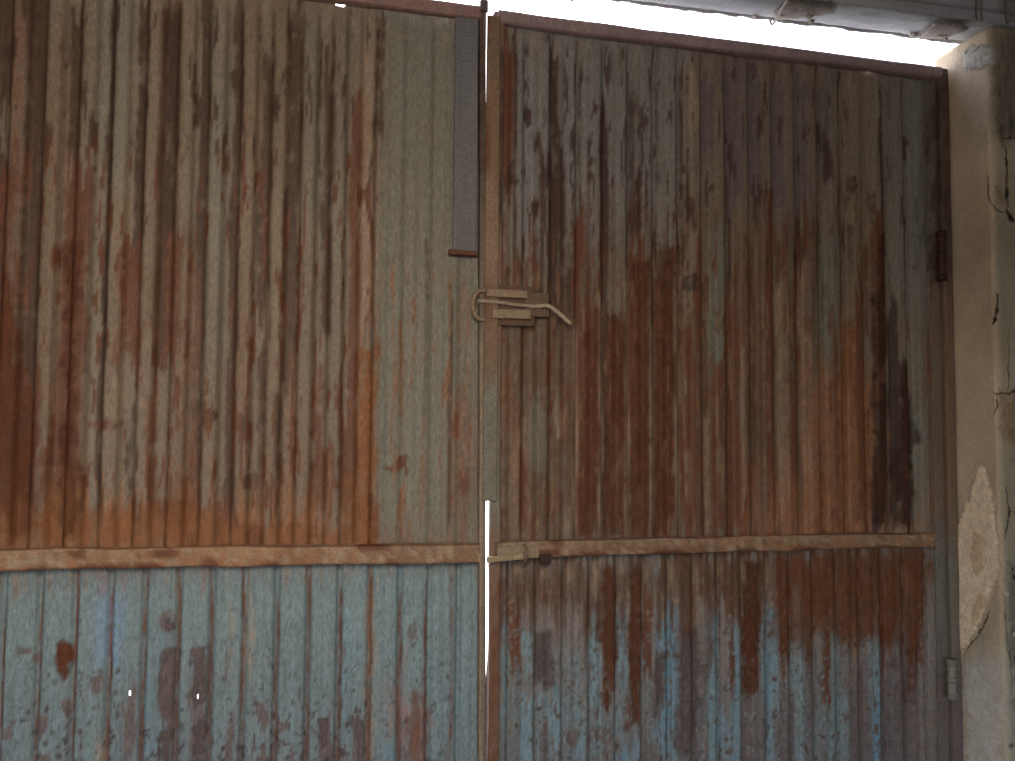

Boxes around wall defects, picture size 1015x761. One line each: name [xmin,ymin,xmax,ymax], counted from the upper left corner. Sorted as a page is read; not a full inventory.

crack [987,136,1015,222]
crack [992,293,1015,413]
flaking render [958,464,1000,657]
crack [1005,486,1013,538]